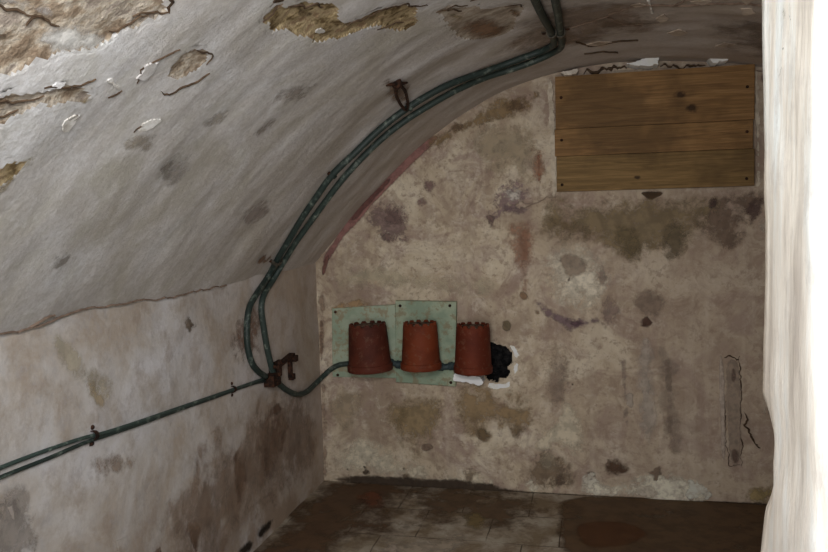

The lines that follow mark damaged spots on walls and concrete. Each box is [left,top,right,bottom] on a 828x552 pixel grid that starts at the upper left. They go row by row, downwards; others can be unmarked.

flaking render [0,0,175,133]
flaking render [259,0,526,46]
crack [0,285,228,335]
damp [176,401,327,551]
damp [240,363,772,552]